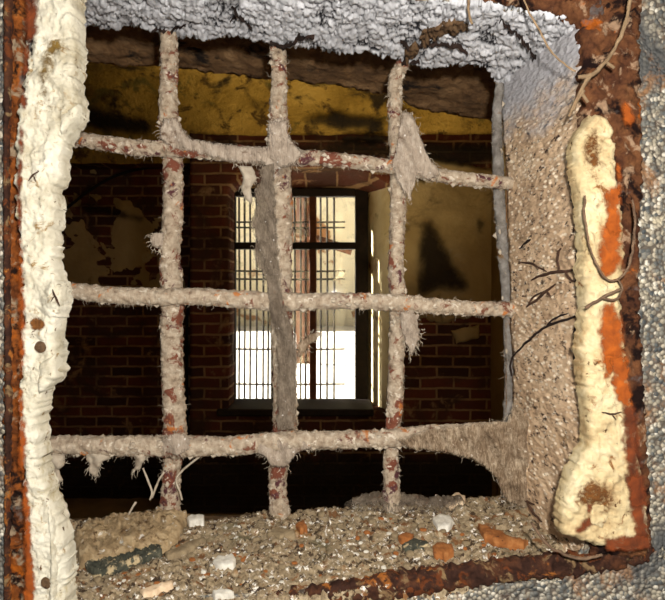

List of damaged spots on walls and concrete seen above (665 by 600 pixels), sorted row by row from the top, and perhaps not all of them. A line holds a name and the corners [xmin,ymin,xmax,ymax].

corrosion [23,0,38,76]
corrosion [623,103,635,125]
corrosion [598,165,622,277]
corrosion [17,260,25,329]
flaking render [14,0,162,600]
corrosion [17,389,27,471]
corrosion [598,302,650,551]
corrosion [22,480,35,600]
corrosion [576,504,592,533]